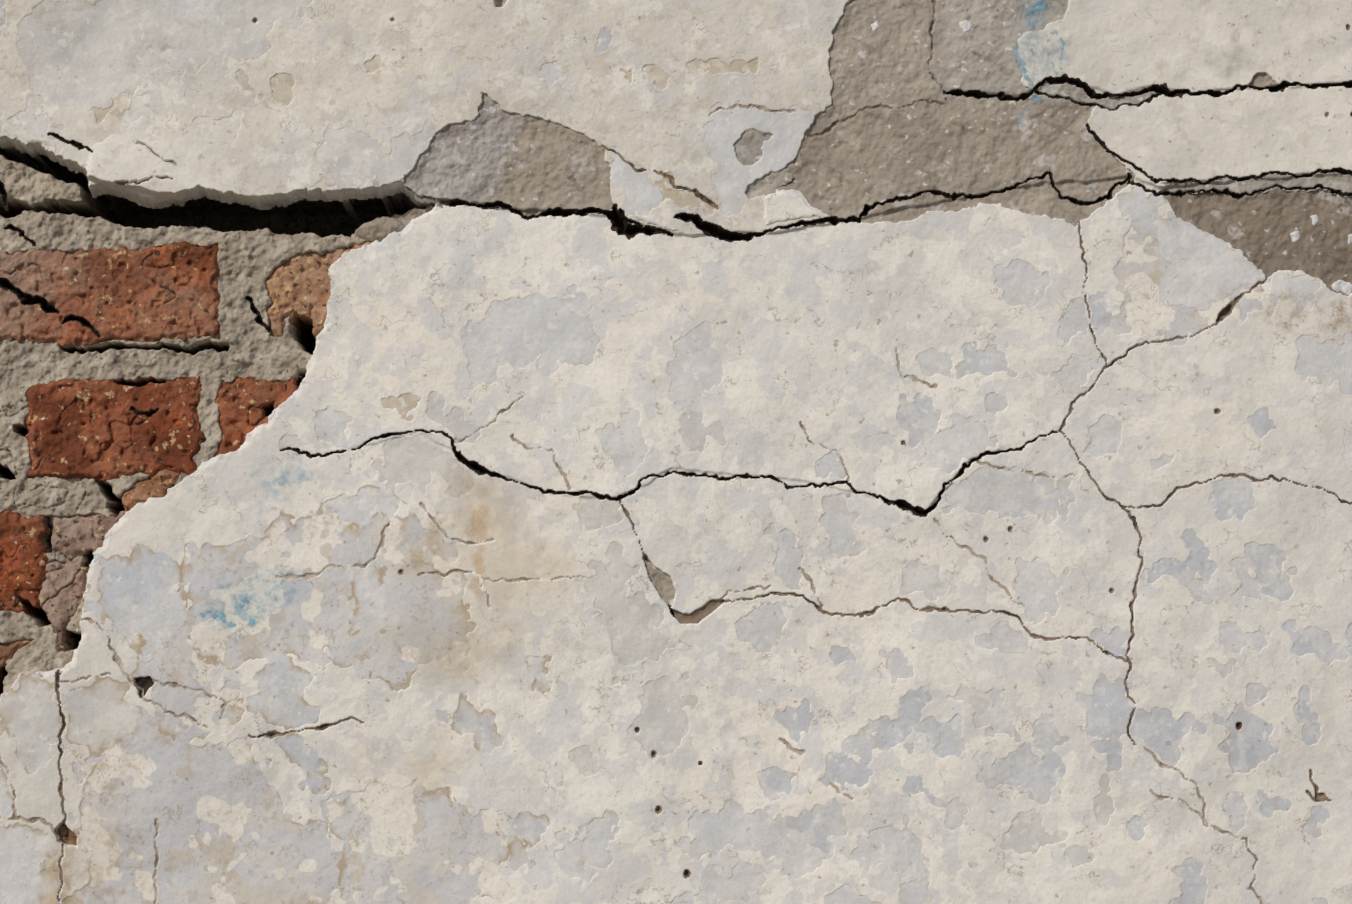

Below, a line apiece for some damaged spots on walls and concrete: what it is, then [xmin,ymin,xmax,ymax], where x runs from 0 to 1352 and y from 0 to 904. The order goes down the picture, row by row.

crack [47,133,93,153]
crack [116,141,178,212]
spalling [315,0,1352,348]
peeling [0,285,624,904]
crack [275,0,1352,904]